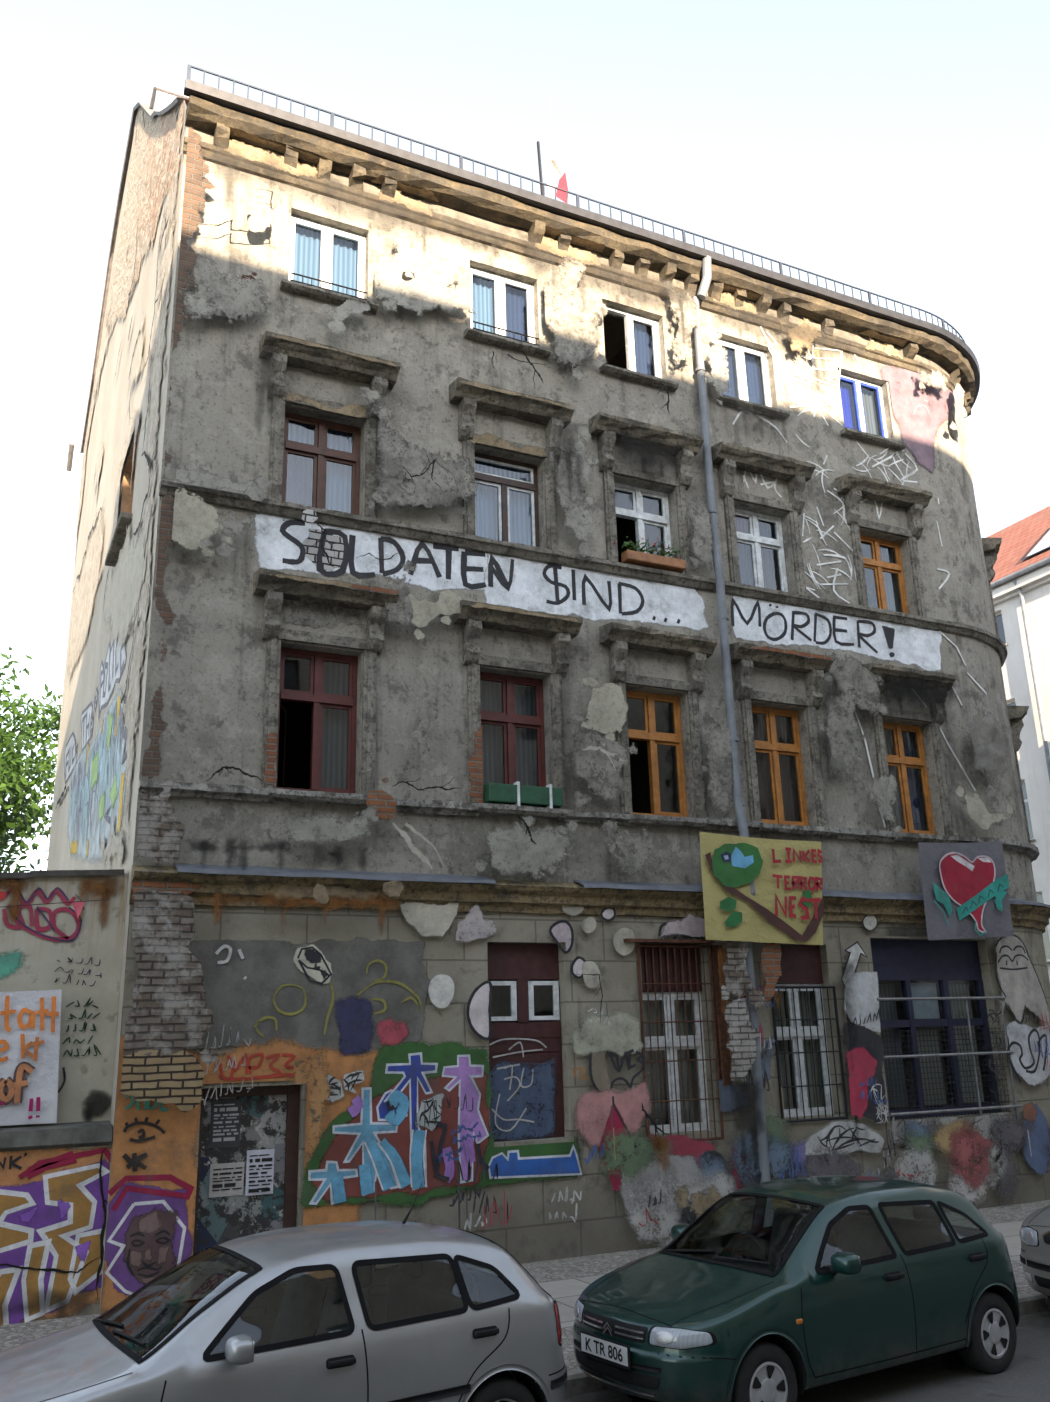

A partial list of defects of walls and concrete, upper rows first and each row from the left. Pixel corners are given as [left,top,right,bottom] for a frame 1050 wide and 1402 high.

flaking render [224,125,328,182]
crack [106,189,276,536]
crack [72,468,134,709]
flaking render [66,102,273,1112]
peeling [270,509,578,640]
flaking render [263,733,277,784]
peeling [475,677,638,882]
peeling [602,819,653,877]
flaking render [721,941,782,1083]